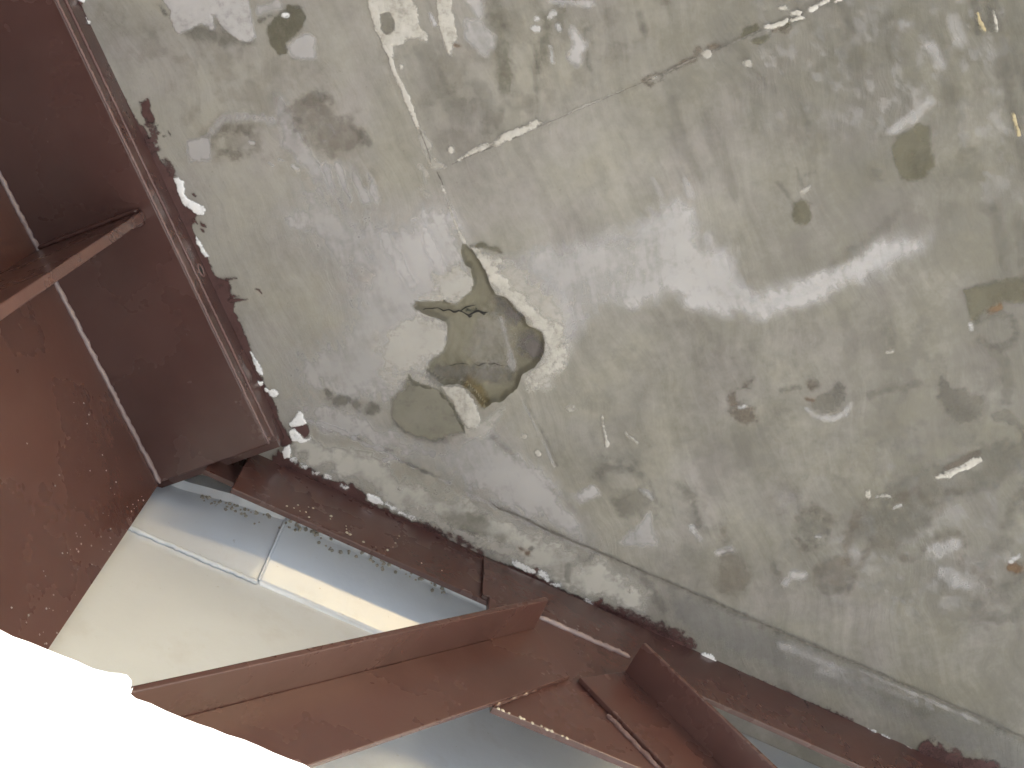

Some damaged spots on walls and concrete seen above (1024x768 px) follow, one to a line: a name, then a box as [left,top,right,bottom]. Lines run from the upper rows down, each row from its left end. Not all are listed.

peeling [162,0,315,58]
damp [188,138,210,161]
damp [893,123,934,180]
damp [793,186,811,225]
crack [423,305,488,318]
damp [472,204,918,392]
damp [268,102,656,611]
spalling [391,243,545,441]